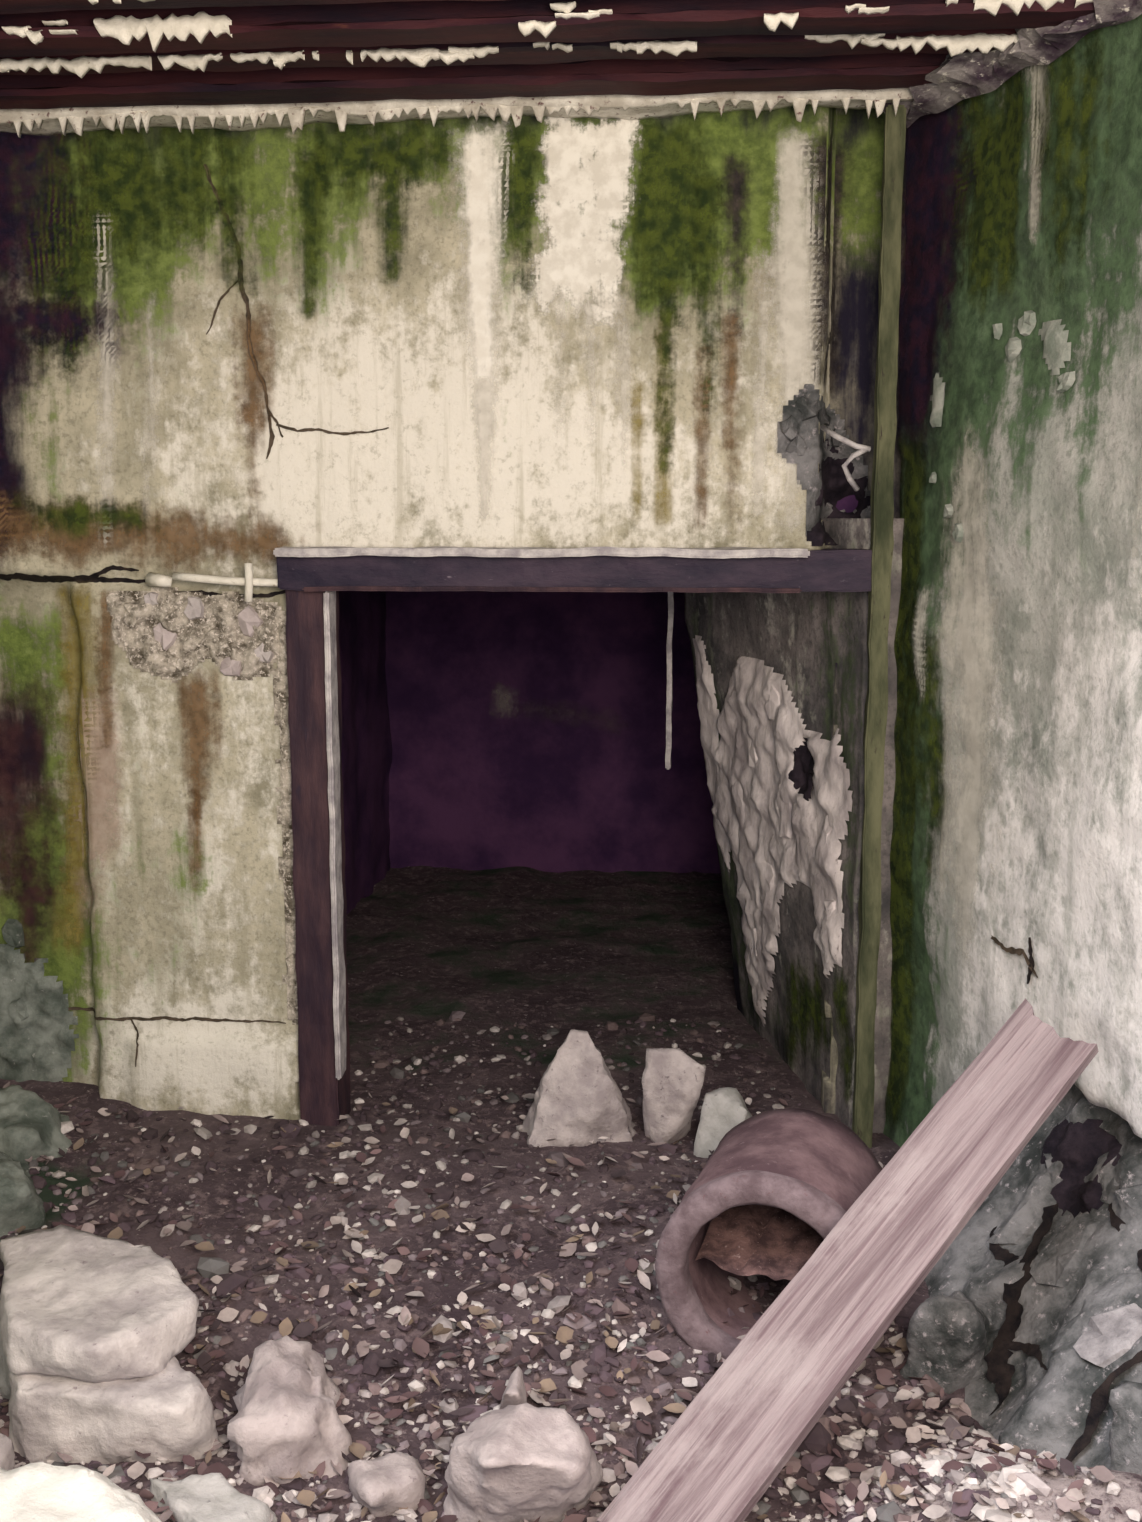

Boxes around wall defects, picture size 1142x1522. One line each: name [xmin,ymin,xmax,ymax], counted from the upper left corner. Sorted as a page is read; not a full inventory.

peeling [0,0,319,78]
peeling [346,46,499,67]
peeling [764,12,1019,57]
leakage [0,127,243,541]
crack [203,163,389,459]
leakage [295,117,749,516]
leakage [756,133,844,407]
crack [0,565,285,598]
leakage [885,30,1102,1123]
flaking render [693,635,853,1027]
crack [984,1203,1058,1416]
crack [1066,1350,1142,1462]